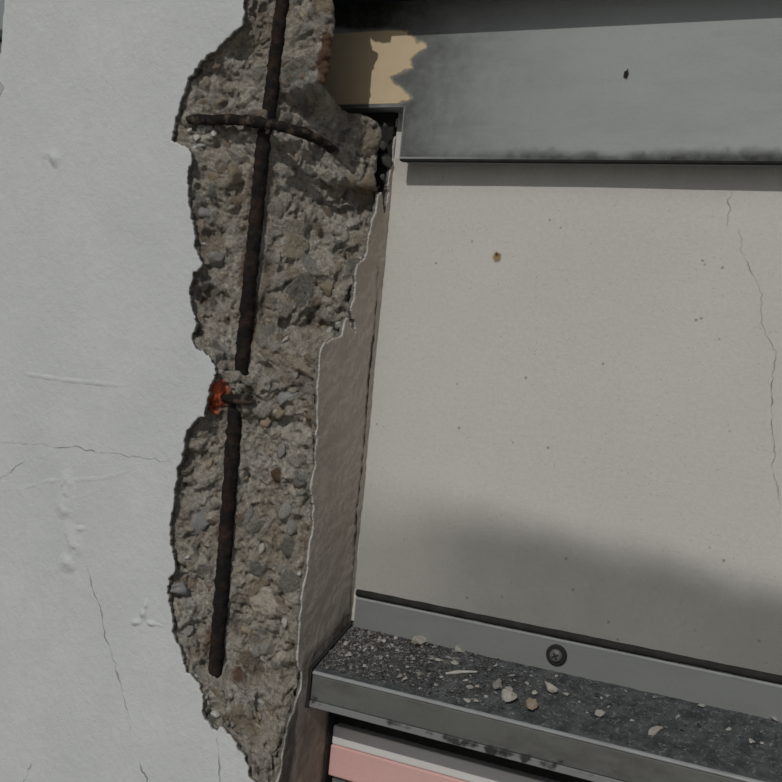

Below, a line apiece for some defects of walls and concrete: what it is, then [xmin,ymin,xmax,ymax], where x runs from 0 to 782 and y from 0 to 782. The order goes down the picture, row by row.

corrosion [317,31,331,85]
corrosion [208,380,228,414]
spalling [169,0,427,782]